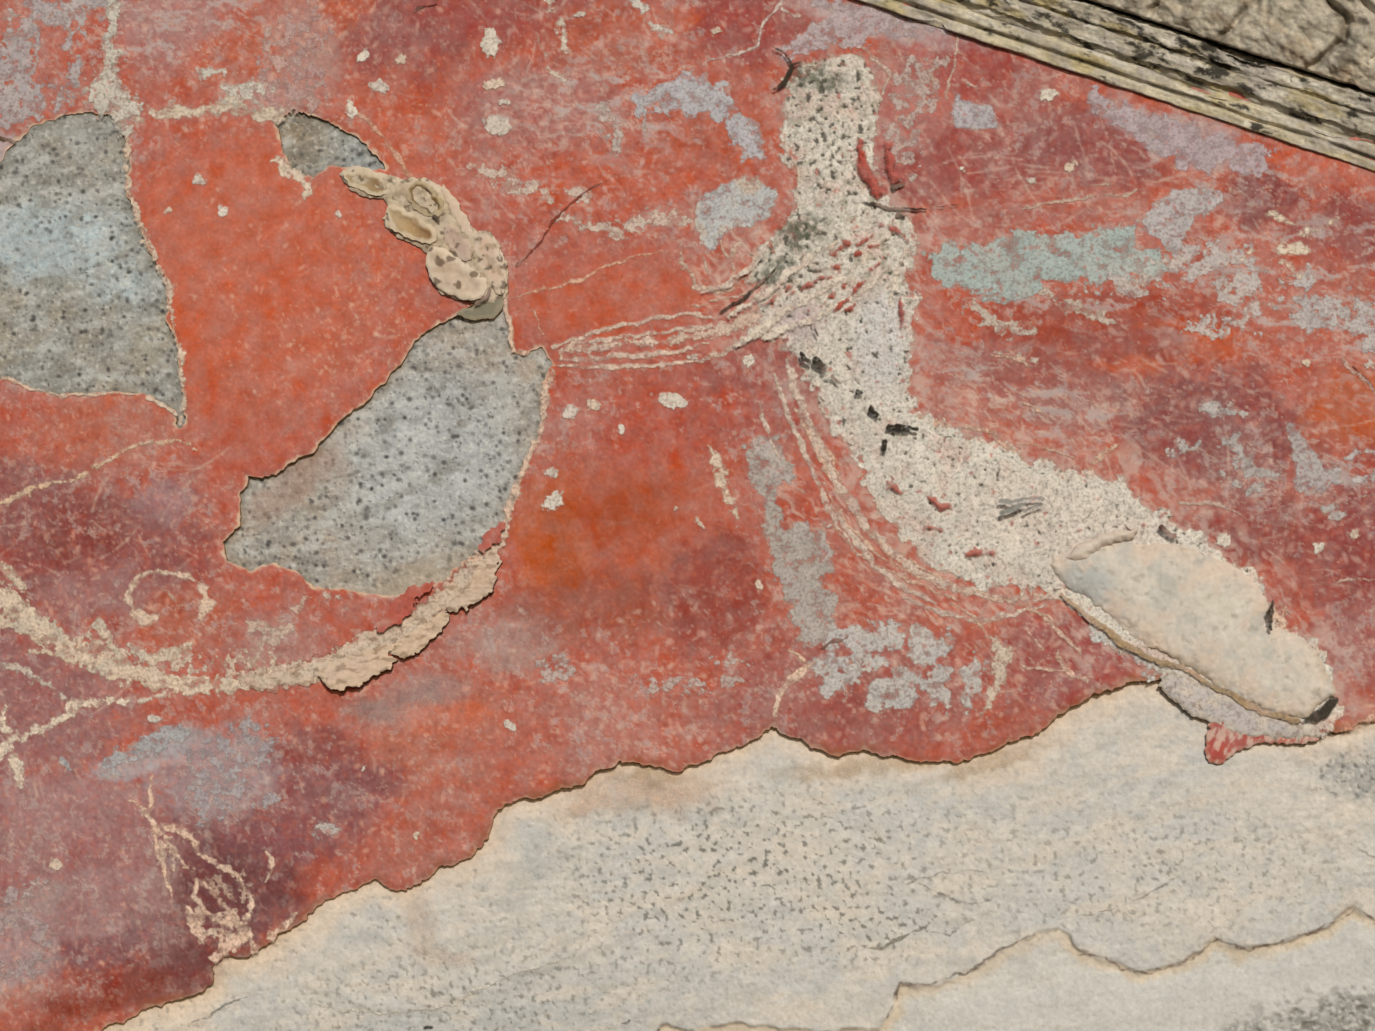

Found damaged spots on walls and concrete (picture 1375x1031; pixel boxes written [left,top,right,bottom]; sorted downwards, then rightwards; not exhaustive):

crack [0,136,16,144]
peeling [884,54,955,167]
peeling [951,94,998,130]
peeling [921,187,1268,341]
spalling [0,0,554,697]
peeling [541,467,563,511]
flaking render [773,358,950,604]
peeling [631,651,750,698]
peeling [741,435,954,717]
flaking render [903,594,1081,655]
peeling [100,714,282,828]
peeling [186,869,253,941]